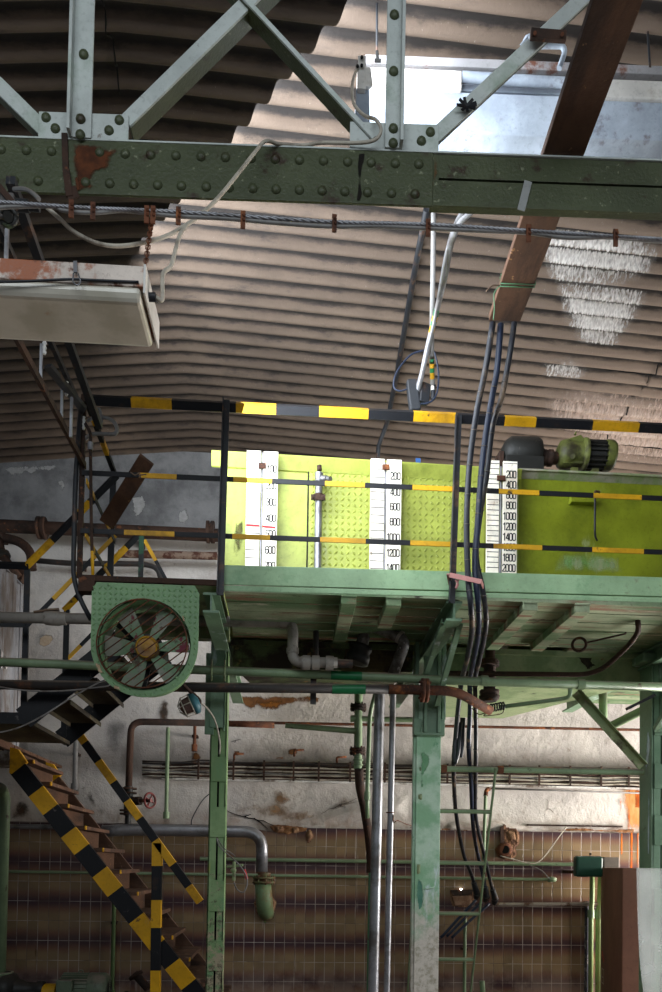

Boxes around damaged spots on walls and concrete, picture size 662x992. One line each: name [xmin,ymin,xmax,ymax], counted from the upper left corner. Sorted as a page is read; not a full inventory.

corrosion [74,145,115,190]
efflorescence [546,231,655,345]
efflorescence [547,365,579,377]
crack [576,362,662,449]